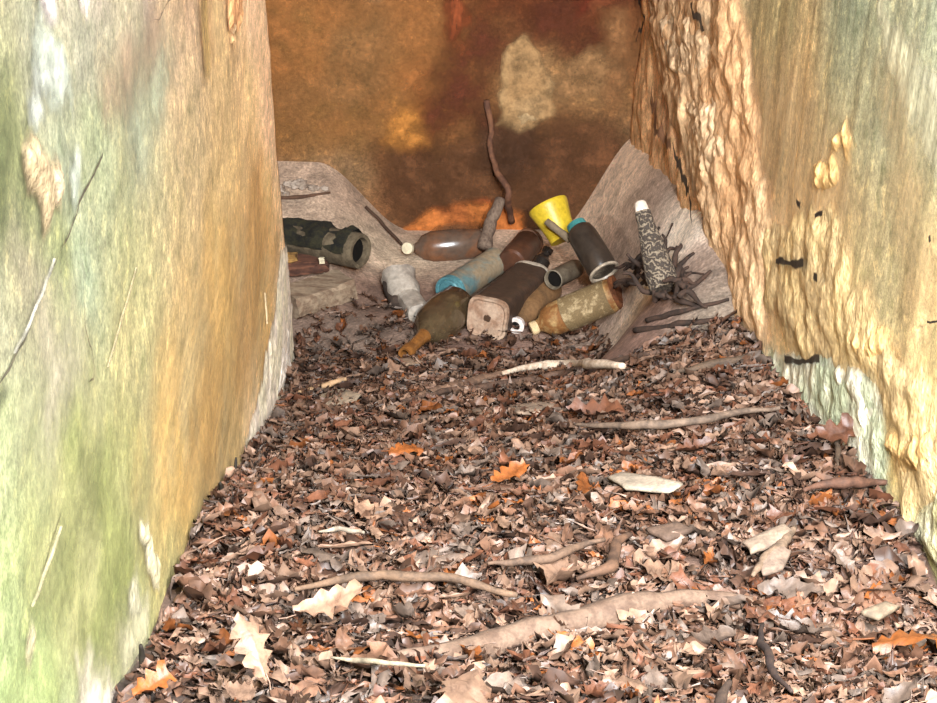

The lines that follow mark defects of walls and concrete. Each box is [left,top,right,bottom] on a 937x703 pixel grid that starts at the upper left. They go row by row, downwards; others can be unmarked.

spalling [228,0,244,47]
spalling [24,137,65,234]
rust [404,200,493,231]
rust [496,208,524,230]
crack [0,142,104,397]